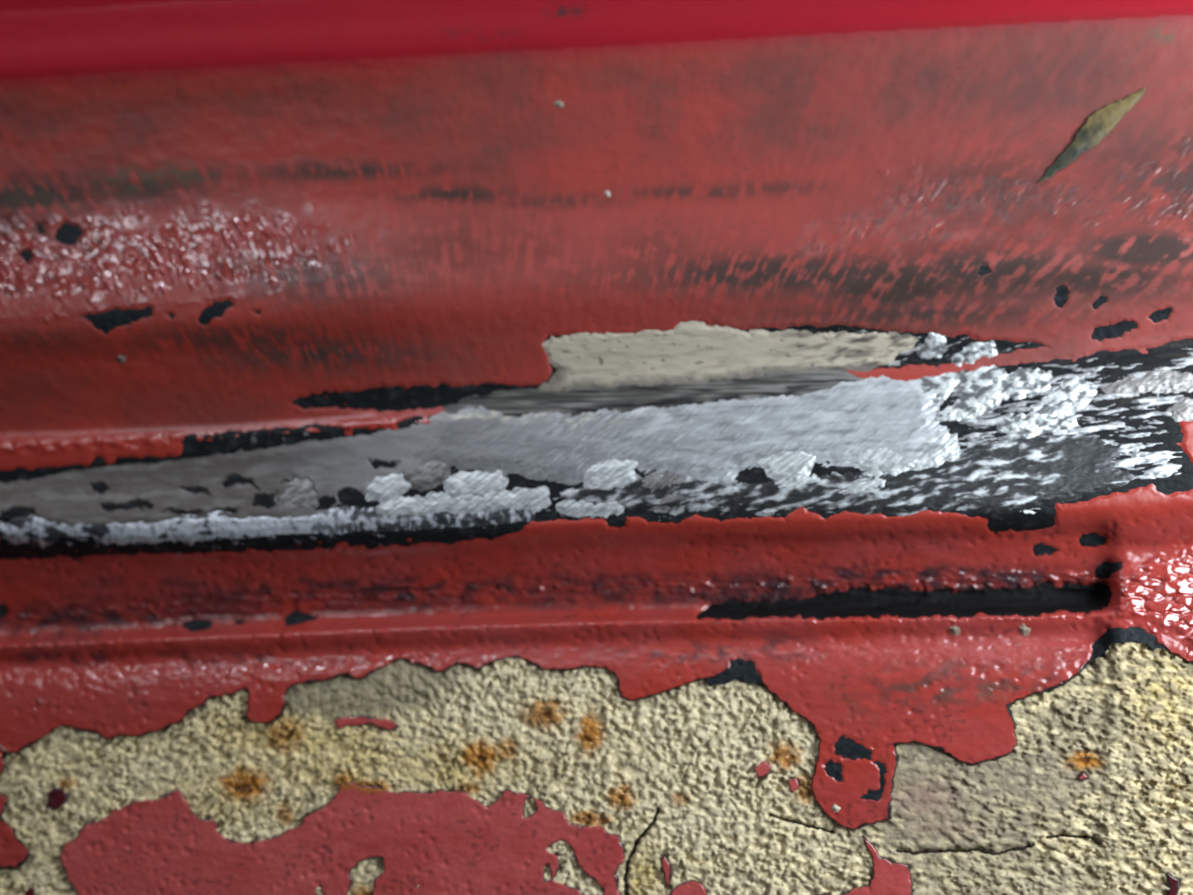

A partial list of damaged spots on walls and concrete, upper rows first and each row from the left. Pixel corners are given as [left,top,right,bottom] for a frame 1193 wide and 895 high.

peeling [36,222,84,245]
peeling [78,306,153,334]
peeling [537,321,919,392]
peeling [696,561,1123,621]
rust [576,716,604,749]
rust [462,741,513,793]
peeling [0,626,1193,895]
rust [770,747,798,766]
rust [610,785,632,807]
crack [770,814,834,833]
crack [624,807,660,895]
crack [896,833,1102,855]